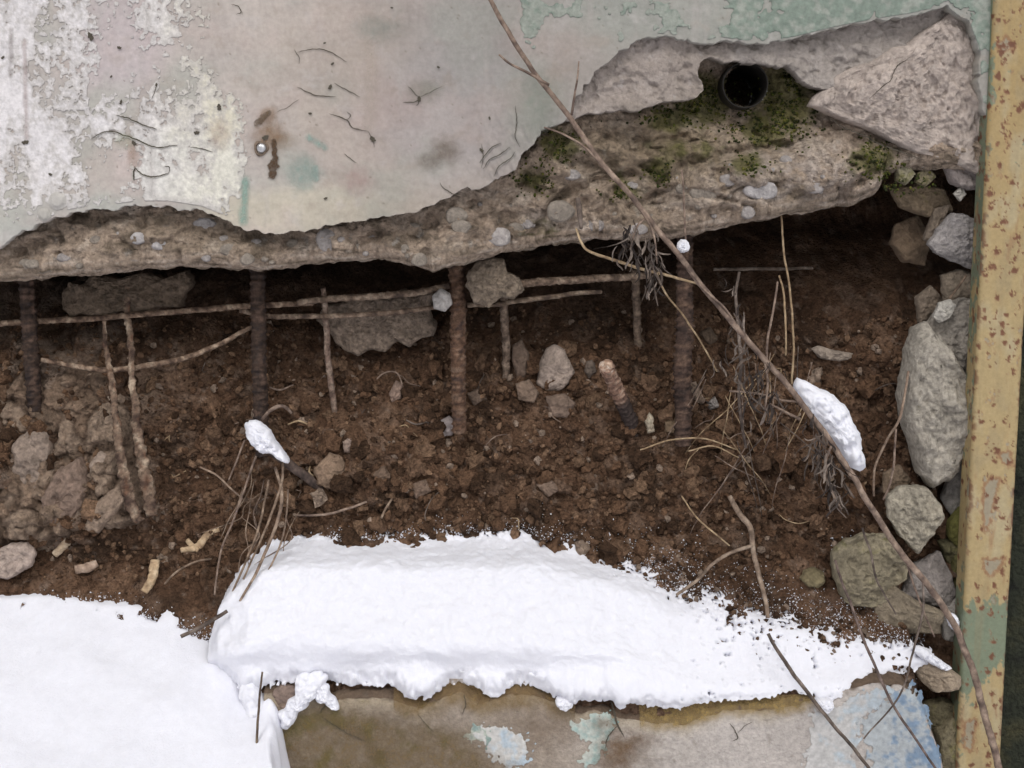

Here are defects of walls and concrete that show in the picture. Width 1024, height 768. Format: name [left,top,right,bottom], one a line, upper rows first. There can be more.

spalling [0,0,991,282]
spalling [0,335,162,552]
peeling [462,722,536,768]
peeling [570,710,619,768]
peeling [801,679,942,768]